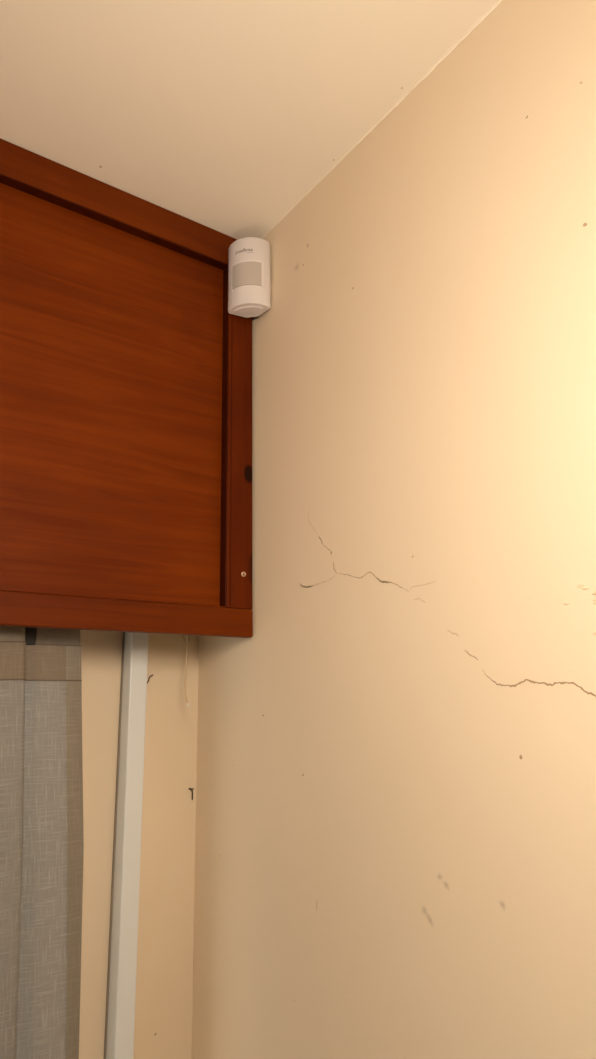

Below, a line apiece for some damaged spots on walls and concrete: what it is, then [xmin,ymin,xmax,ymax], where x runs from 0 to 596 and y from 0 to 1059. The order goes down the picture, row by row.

crack [300,508,435,603]
crack [447,630,596,697]